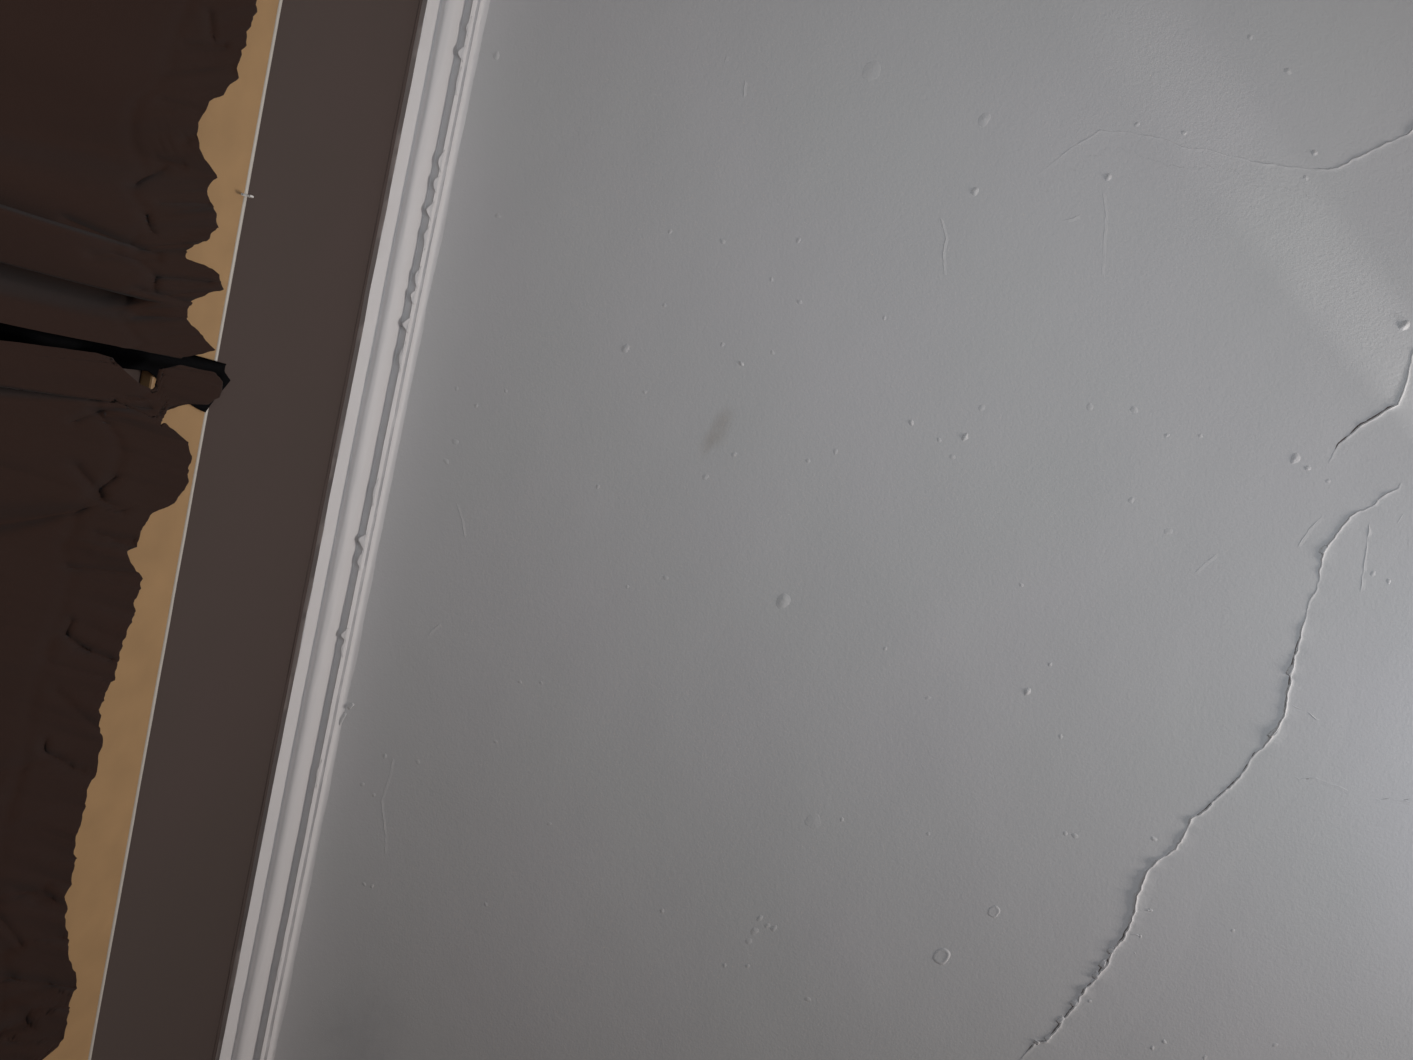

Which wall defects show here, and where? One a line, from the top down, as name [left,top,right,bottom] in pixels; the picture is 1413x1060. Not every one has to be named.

crack [1328,350,1413,473]
crack [1020,482,1413,1060]